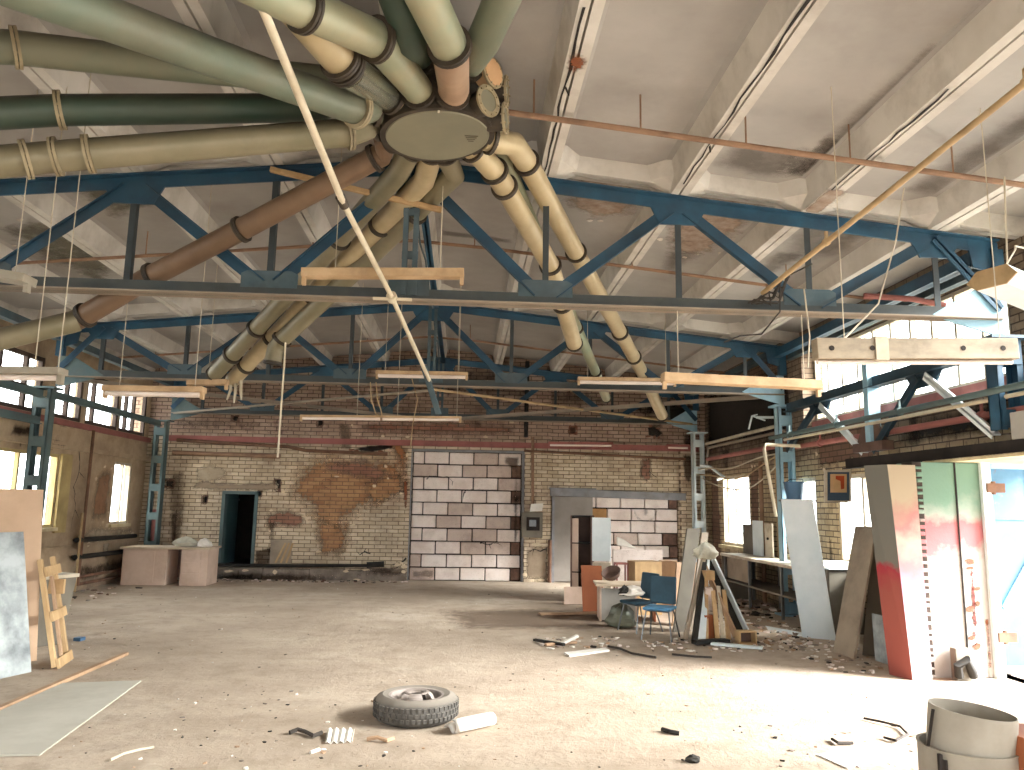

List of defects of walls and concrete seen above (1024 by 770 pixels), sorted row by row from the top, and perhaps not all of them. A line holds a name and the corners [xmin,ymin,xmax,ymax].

peeling [78,466,134,552]
peeling [258,421,514,553]